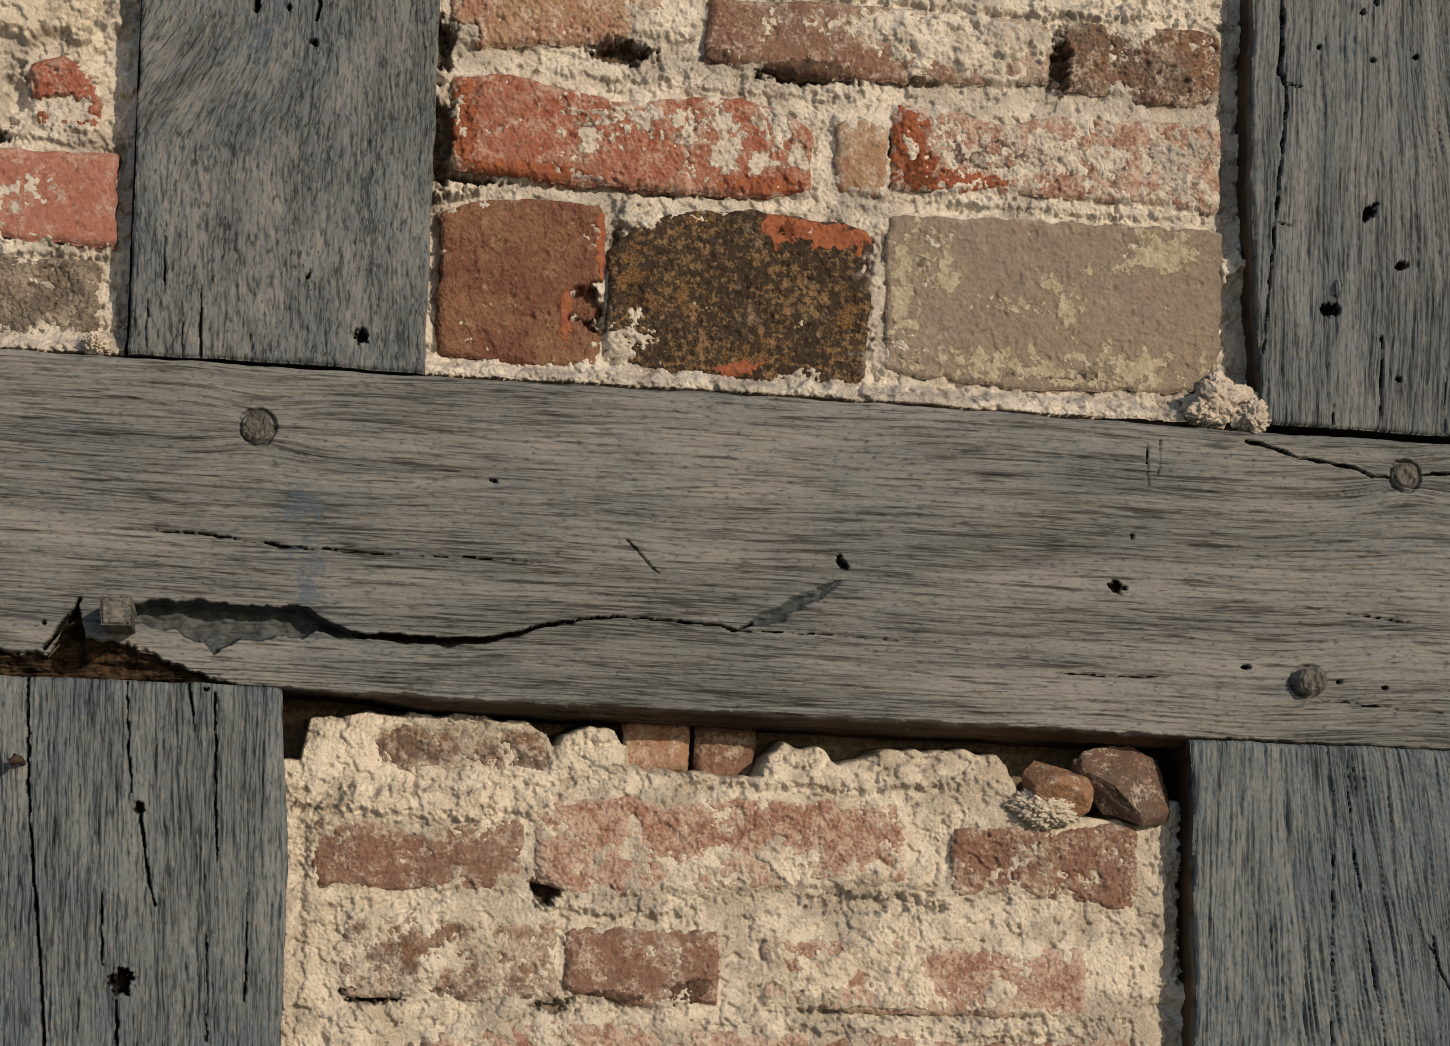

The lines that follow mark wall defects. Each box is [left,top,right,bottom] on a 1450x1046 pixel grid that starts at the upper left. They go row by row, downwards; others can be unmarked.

crack [1261,0,1302,351]
crack [1377,337,1385,419]
crack [1244,440,1450,479]
crack [159,531,384,555]
crack [361,615,815,648]
crack [125,695,133,778]
crack [188,684,218,859]
crack [26,599,82,1046]
crack [139,813,156,907]
crack [98,905,106,961]
crack [241,922,249,1002]
crack [112,1010,120,1046]